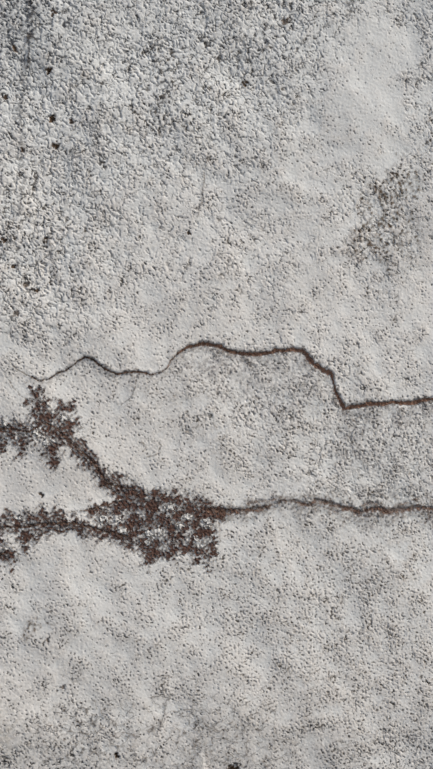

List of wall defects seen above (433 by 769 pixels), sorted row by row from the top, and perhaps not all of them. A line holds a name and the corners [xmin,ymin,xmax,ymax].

crack [8,342,433,414]
rust [0,385,241,574]
crack [203,495,433,524]